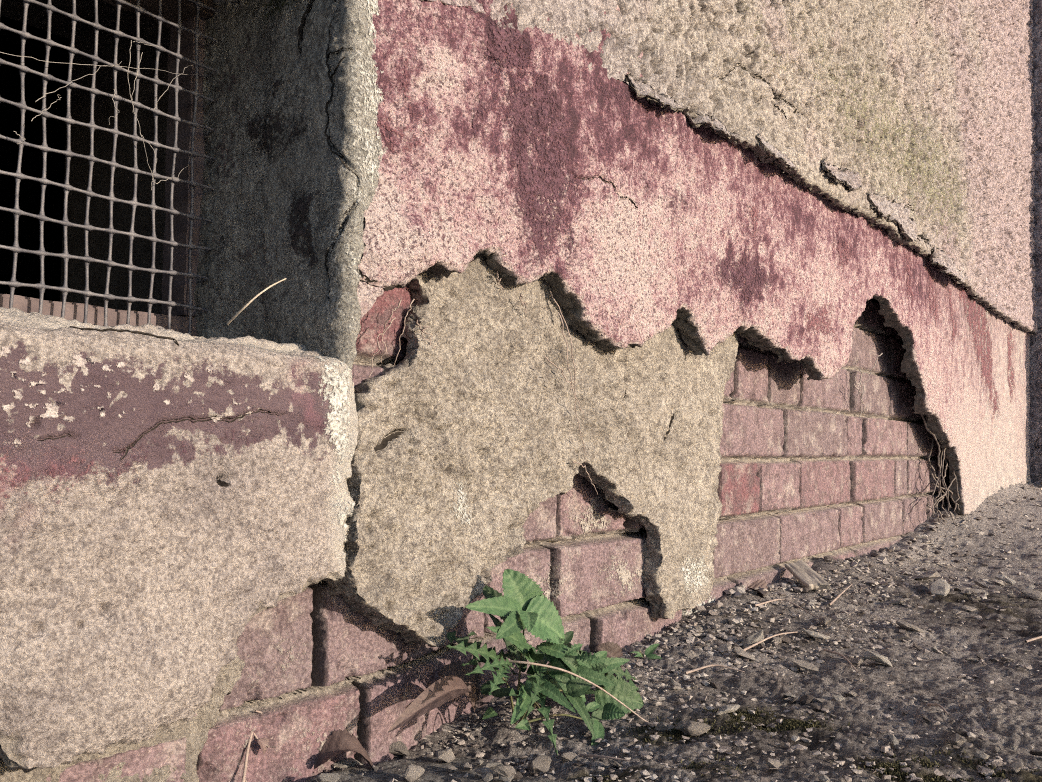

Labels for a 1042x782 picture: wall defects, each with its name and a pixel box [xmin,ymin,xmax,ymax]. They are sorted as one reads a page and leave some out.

flaking render [626,73,738,139]
crack [298,0,363,301]
water stain [472,20,584,266]
flaking render [756,133,796,171]
crack [568,172,638,210]
flaking render [820,159,921,243]
crack [357,269,402,291]
flaking render [929,245,968,284]
crack [70,326,179,346]
water stain [929,268,1015,418]
crack [113,409,284,461]
spalling [0,254,950,782]